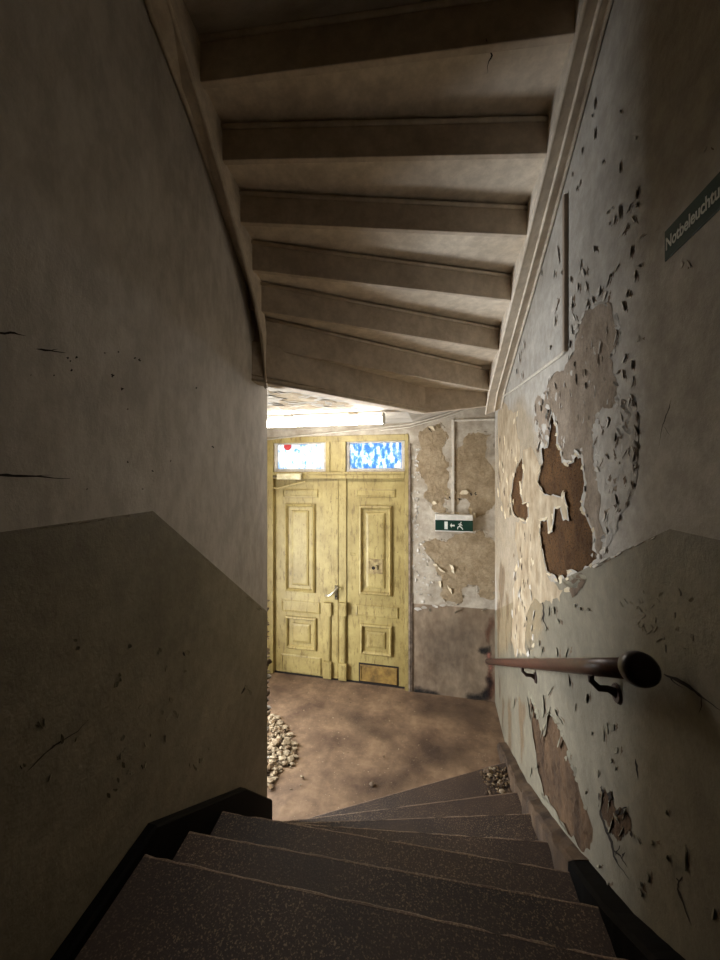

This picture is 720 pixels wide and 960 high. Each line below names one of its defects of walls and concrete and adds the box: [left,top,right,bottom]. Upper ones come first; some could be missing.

crack [0,331,64,353]
crack [0,472,70,480]
peeling [414,234,656,658]
spalling [513,686,593,852]
peeling [597,770,660,859]